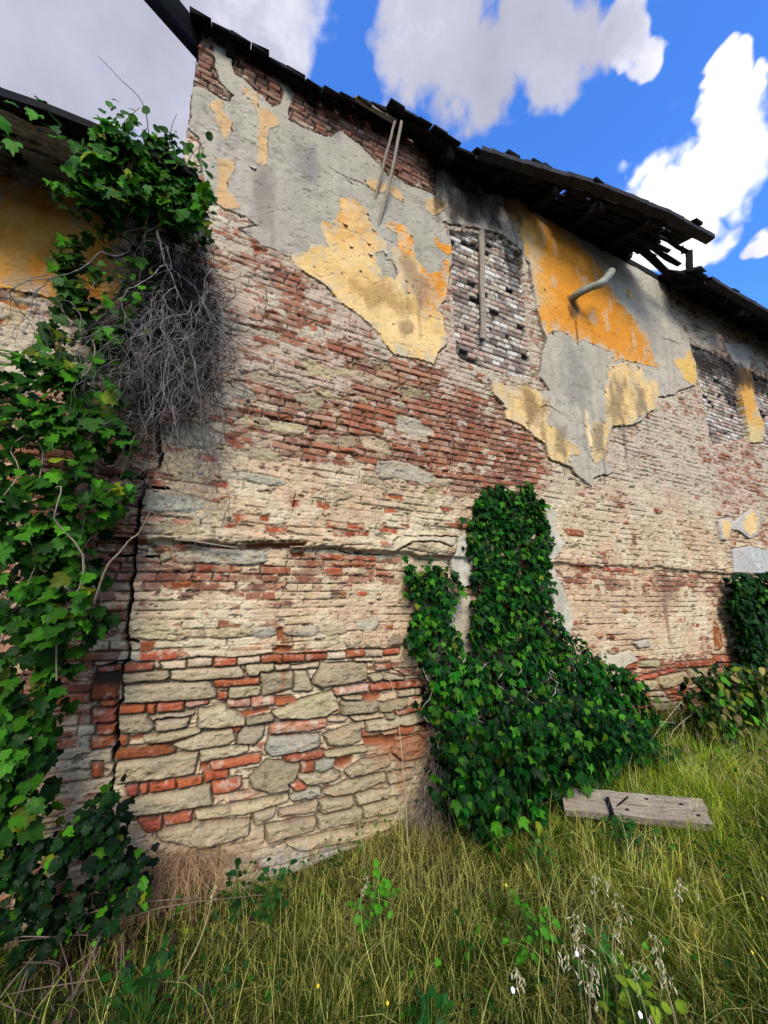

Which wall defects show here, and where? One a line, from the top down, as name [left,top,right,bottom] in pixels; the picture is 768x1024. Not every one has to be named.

flaking render [193,38,447,215]
peeling [291,198,452,364]
peeling [492,198,659,467]
peeling [673,350,698,385]
peeling [738,368,764,443]
peeling [722,510,759,538]
crack [108,403,453,814]